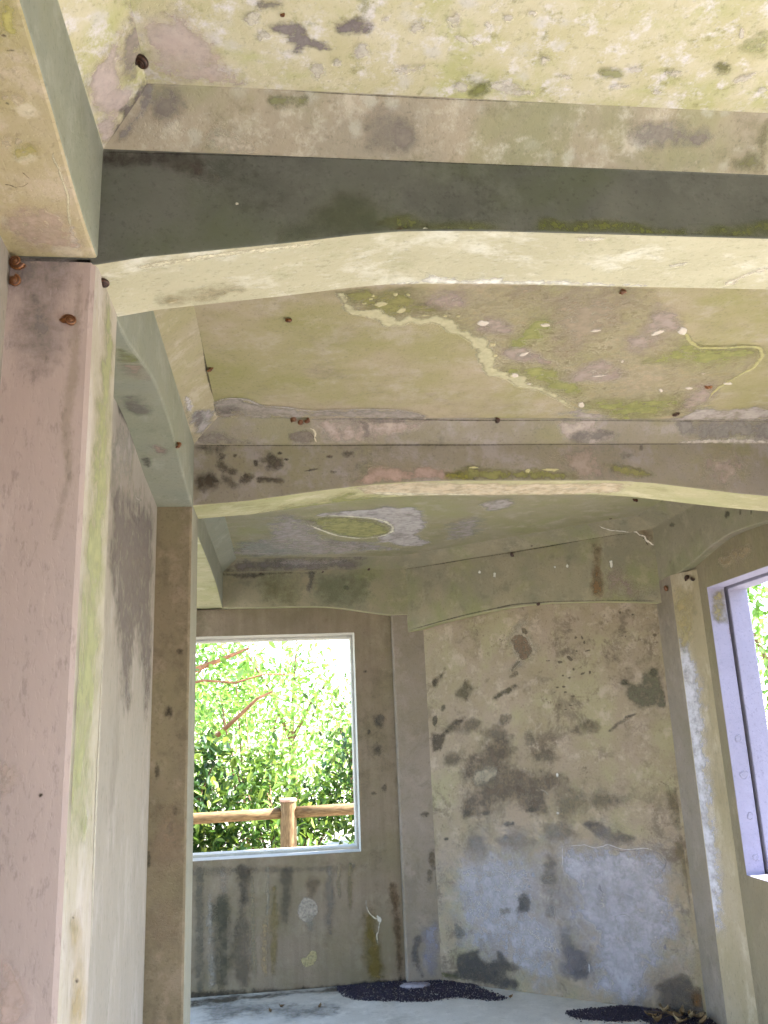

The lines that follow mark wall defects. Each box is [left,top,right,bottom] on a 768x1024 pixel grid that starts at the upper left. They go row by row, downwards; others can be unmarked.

damp [272,24,328,53]
damp [336,18,372,34]
peeling [337,290,764,420]
damp [185,397,425,489]
damp [111,397,165,708]
peeling [310,507,429,546]
damp [574,669,666,732]
damp [412,715,704,1014]
damp [191,864,385,1020]